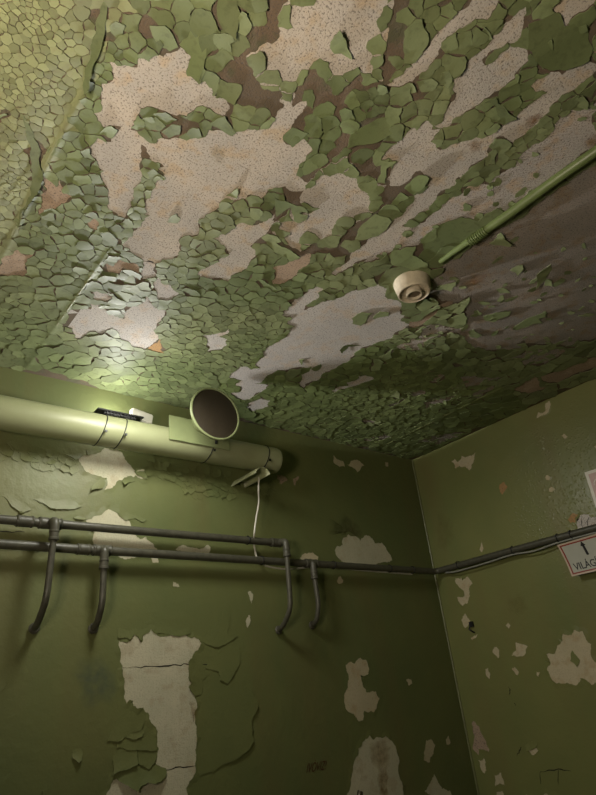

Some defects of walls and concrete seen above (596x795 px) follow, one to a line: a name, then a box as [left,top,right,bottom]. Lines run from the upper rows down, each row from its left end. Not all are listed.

peeling [17,0,596,419]
peeling [0,239,48,287]
peeling [67,446,151,493]
peeling [0,494,163,568]
peeling [332,531,395,571]
peeling [536,625,596,690]
peeling [102,624,209,795]
peeling [341,654,406,795]
peeling [470,720,506,795]